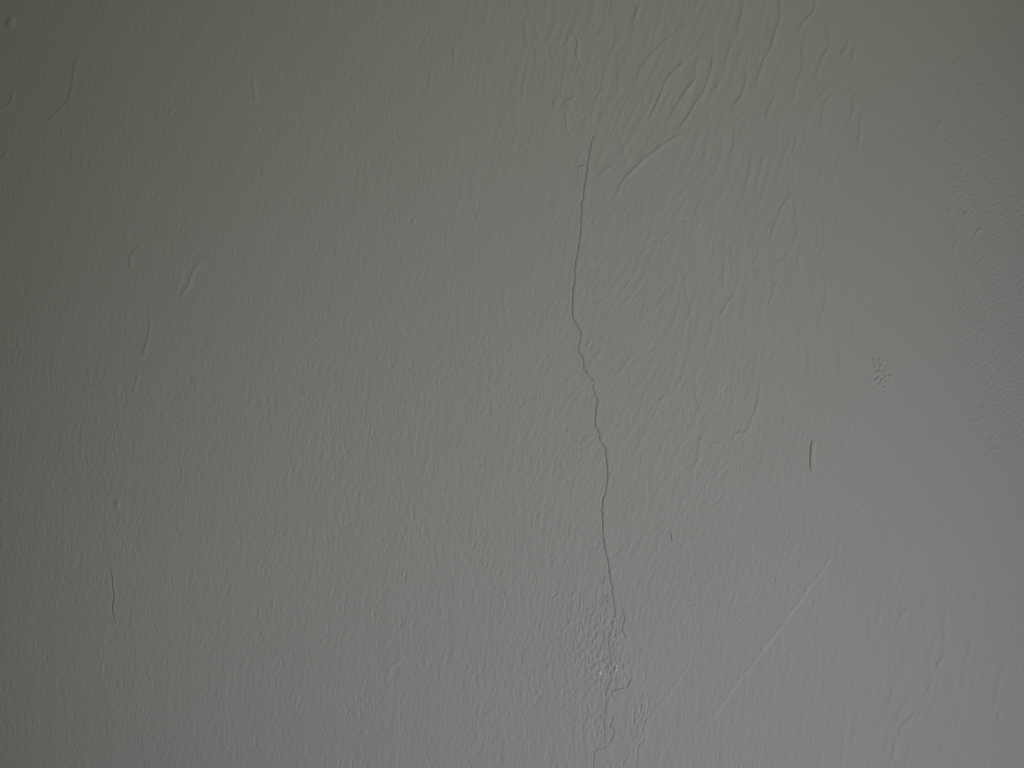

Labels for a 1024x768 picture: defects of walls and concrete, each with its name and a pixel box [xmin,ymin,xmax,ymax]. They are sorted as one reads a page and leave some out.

crack [568,134,634,768]